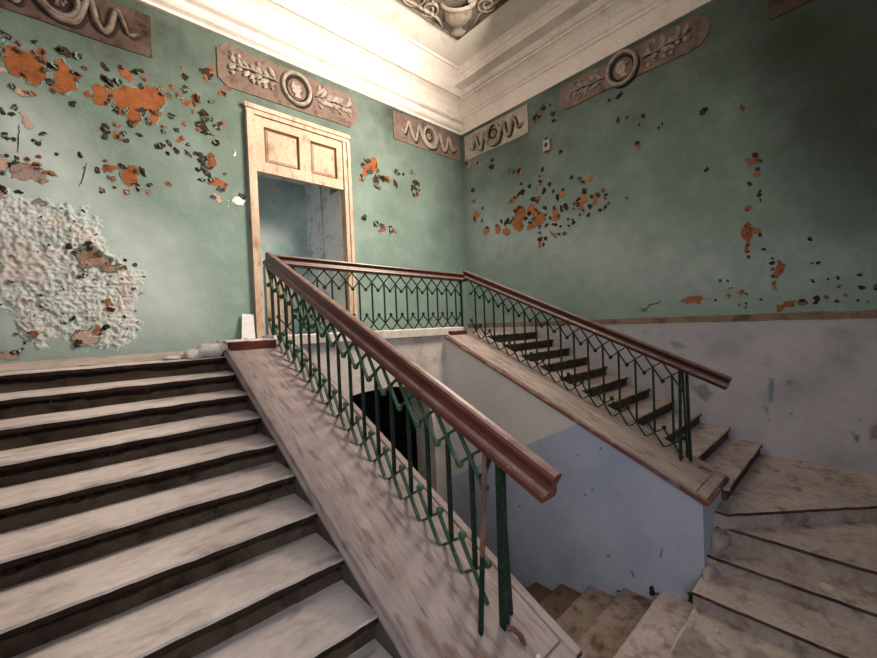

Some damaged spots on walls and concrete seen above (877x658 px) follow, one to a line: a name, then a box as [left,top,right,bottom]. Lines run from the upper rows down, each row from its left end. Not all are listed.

peeling [0,29,246,207]
peeling [529,103,556,127]
peeling [359,156,421,198]
peeling [361,214,397,235]
peeling [471,166,610,248]
peeling [741,152,786,290]
flaking render [65,241,137,279]
peeling [680,279,748,309]
peeling [776,273,877,312]
flaking render [69,316,110,348]
flaking render [0,348,24,361]